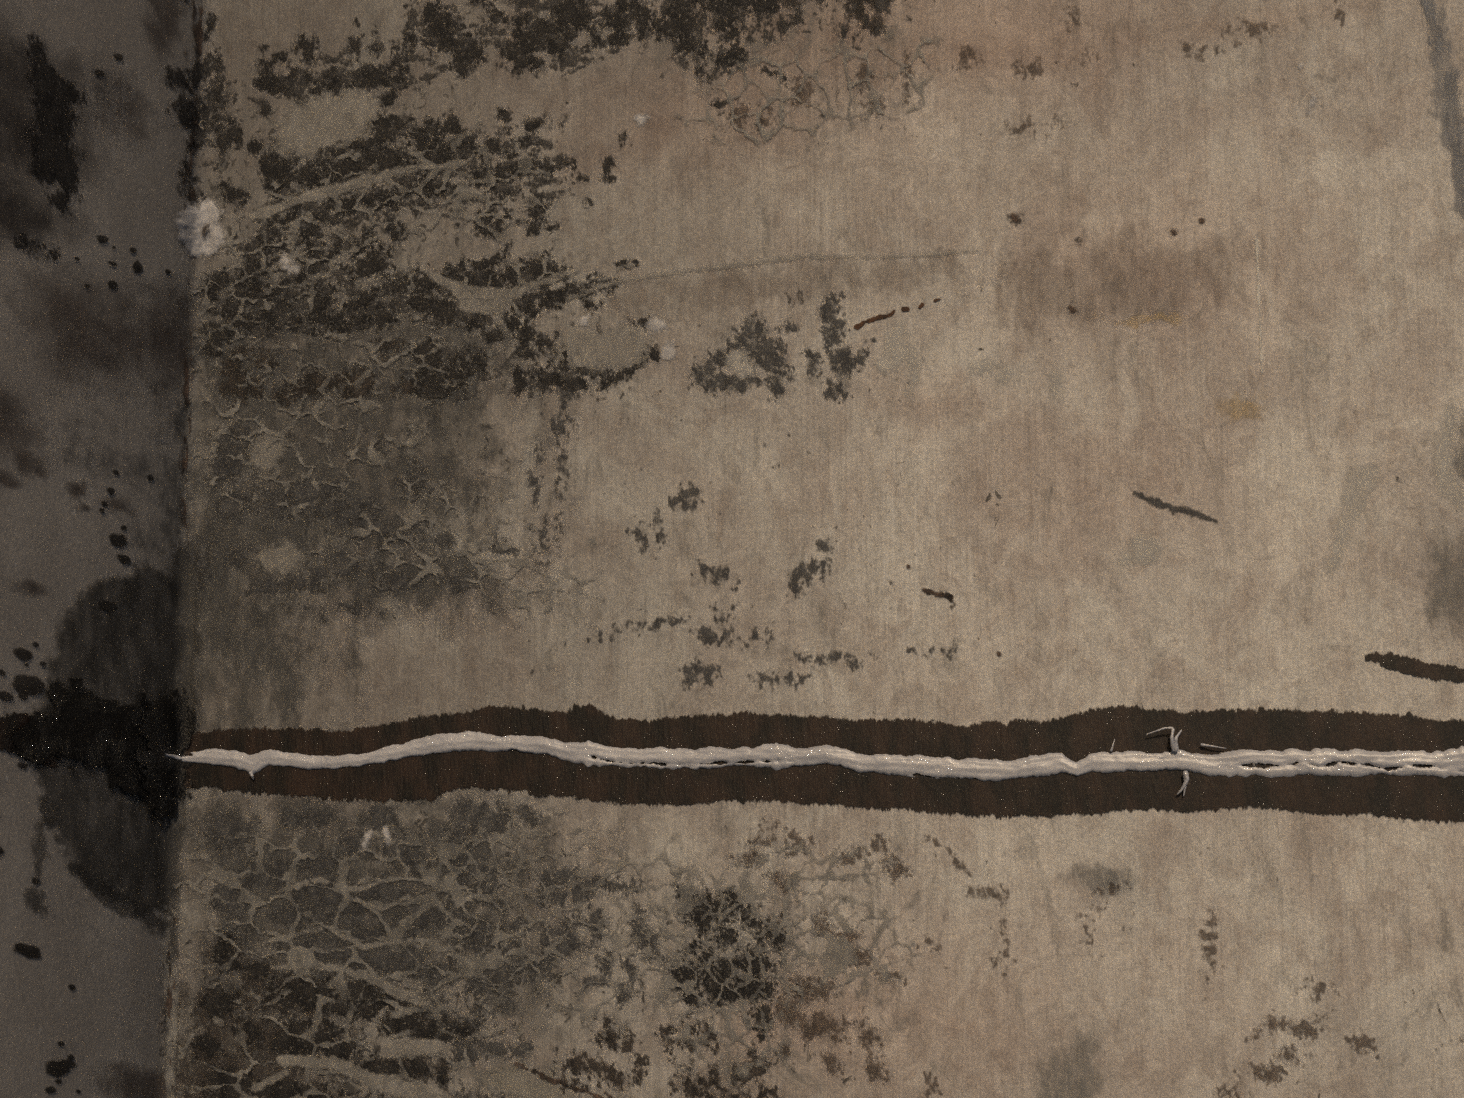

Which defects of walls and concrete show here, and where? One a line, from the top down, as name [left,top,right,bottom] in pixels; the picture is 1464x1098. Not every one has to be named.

leakage [0,33,87,259]
leakage [1421,0,1464,216]
crack [1365,651,1464,683]
crack [0,712,58,768]
crack [166,703,1464,823]
crack [514,1062,613,1098]